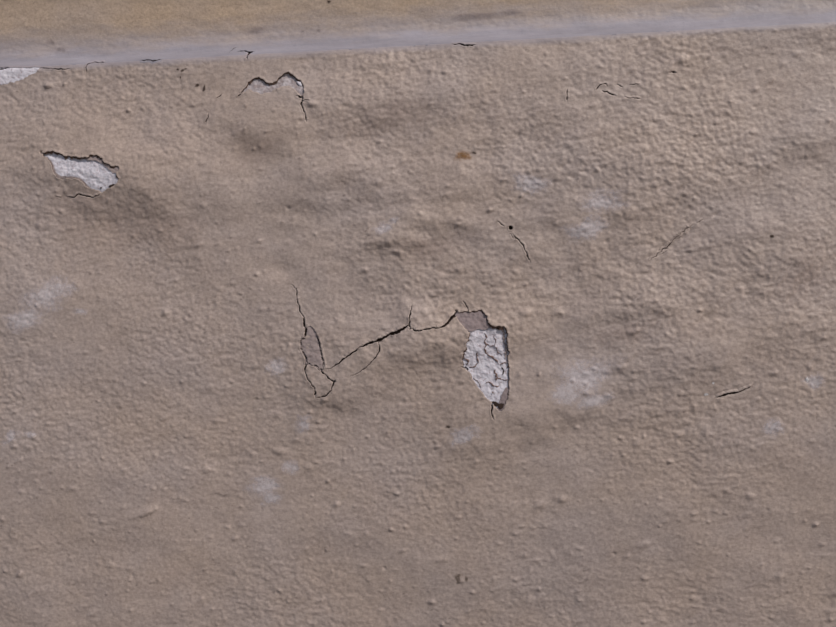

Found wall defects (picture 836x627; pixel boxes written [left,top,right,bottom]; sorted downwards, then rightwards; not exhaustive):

peeling [0,65,41,87]
peeling [236,69,310,123]
peeling [40,148,121,200]
crack [497,219,532,262]
crack [325,305,457,379]
peeling [455,300,512,421]